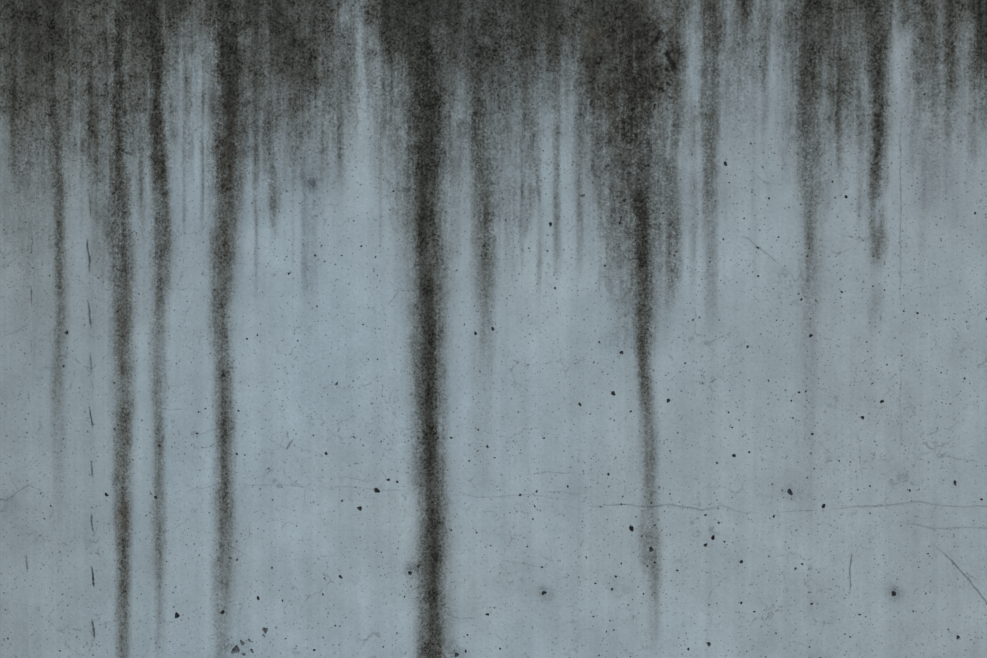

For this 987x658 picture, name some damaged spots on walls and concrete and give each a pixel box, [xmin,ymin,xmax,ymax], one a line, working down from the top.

water stain [46,54,64,356]
water stain [111,10,132,658]
water stain [153,368,163,560]
water stain [149,0,171,339]
water stain [212,0,247,588]
water stain [405,35,447,658]
water stain [471,86,493,310]
water stain [590,3,679,495]
water stain [701,0,719,202]
water stain [796,0,819,181]
water stain [869,25,887,199]
water stain [946,0,957,64]